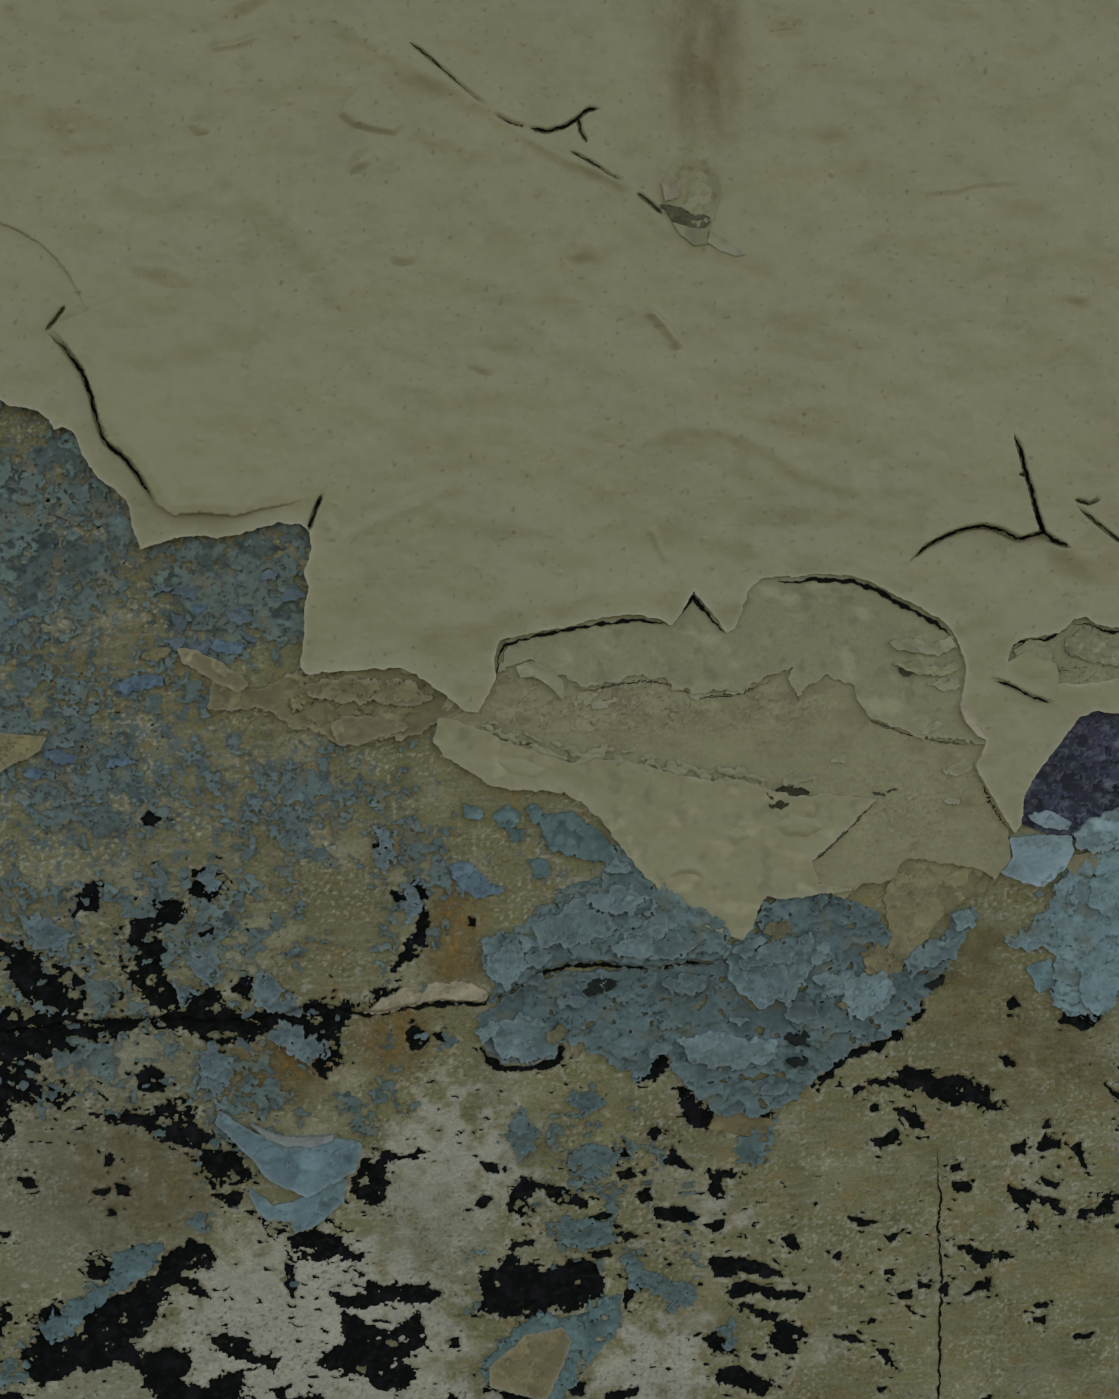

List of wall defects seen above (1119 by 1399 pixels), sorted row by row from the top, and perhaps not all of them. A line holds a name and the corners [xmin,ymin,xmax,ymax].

crack [411,43,662,214]
crack [46,307,150,493]
crack [912,434,1069,559]
crack [1076,499,1119,541]
peeling [0,286,1119,1399]